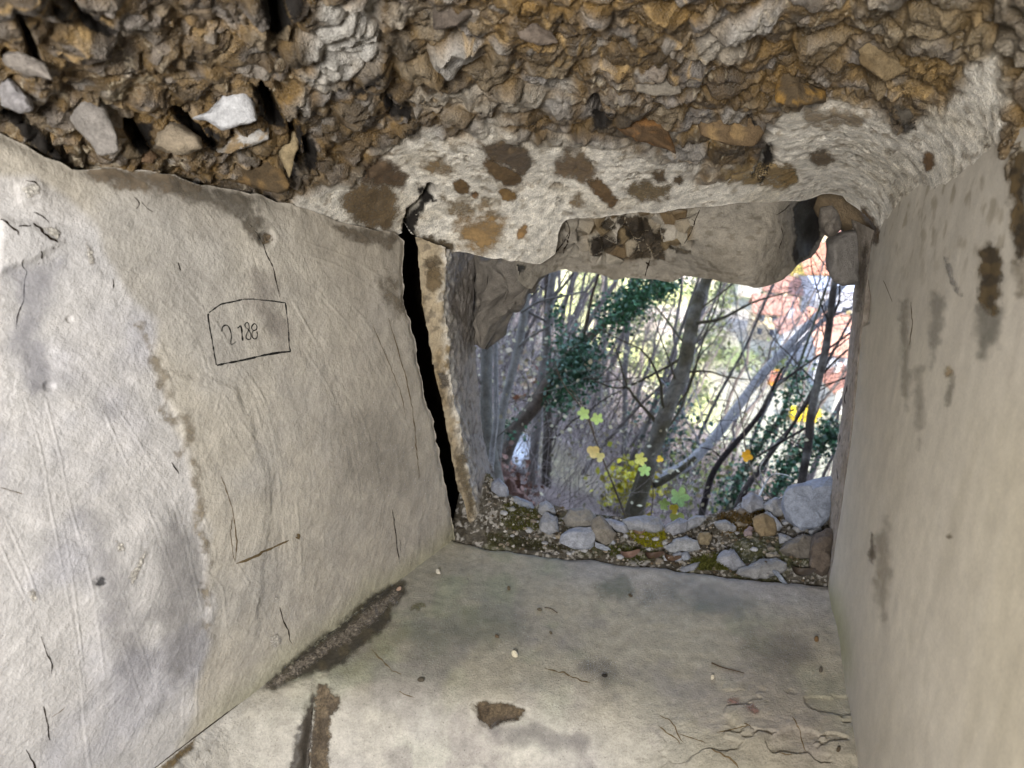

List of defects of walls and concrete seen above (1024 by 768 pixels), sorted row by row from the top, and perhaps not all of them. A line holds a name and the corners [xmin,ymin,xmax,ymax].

leakage [423,160,489,215]
leakage [477,141,531,175]
leakage [555,147,618,209]
leakage [337,225,397,251]
leakage [422,235,454,252]
crack [373,222,460,522]
spalling [308,684,340,768]
spalling [475,701,525,729]
crack [660,716,751,768]
crack [779,717,806,755]